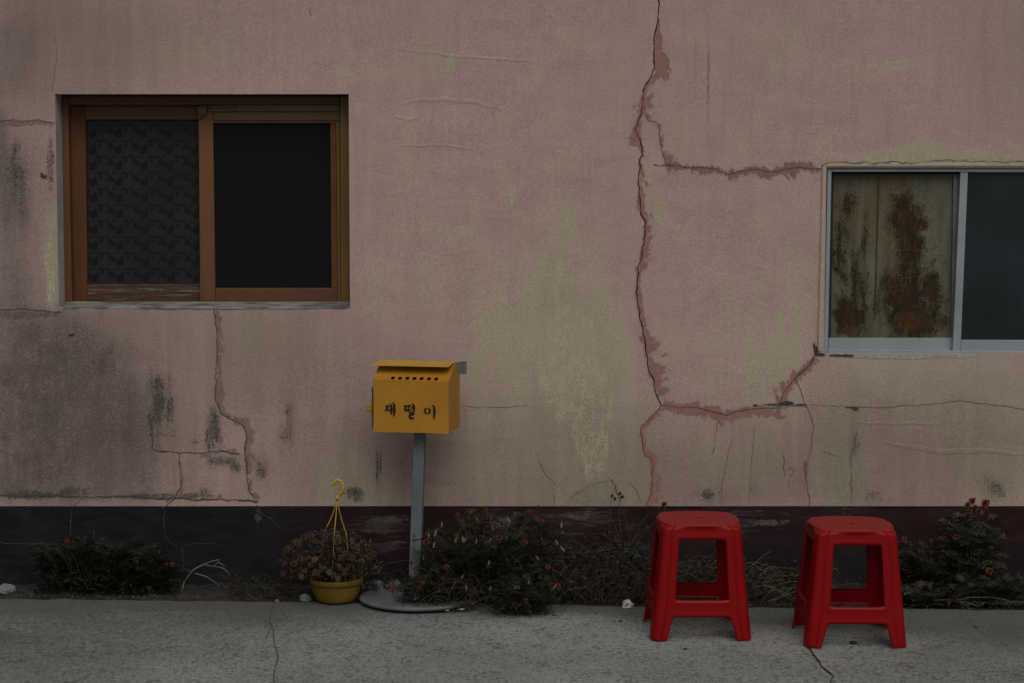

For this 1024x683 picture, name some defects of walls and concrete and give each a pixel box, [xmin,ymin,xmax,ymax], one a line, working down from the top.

crack [535,0,1024,506]
rust [831,175,951,338]
water stain [0,319,177,509]
crack [0,305,283,576]
water stain [192,402,269,483]